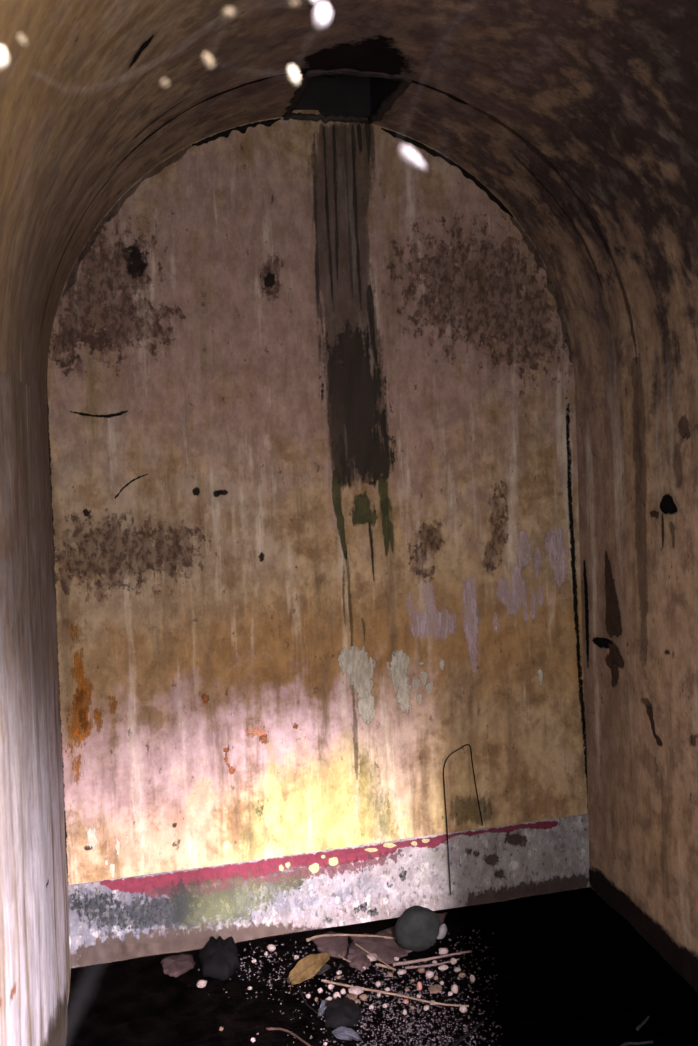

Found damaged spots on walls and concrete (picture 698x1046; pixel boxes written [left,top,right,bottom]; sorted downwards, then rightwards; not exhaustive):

leakage [387,211,573,395]
leakage [319,121,397,581]
leakage [53,509,211,601]
leakage [408,520,444,579]
leakage [483,480,509,575]
rust [65,624,117,784]
peeling [338,646,433,724]
peeling [84,826,98,850]
peeling [100,821,558,900]
spalling [437,923,447,939]